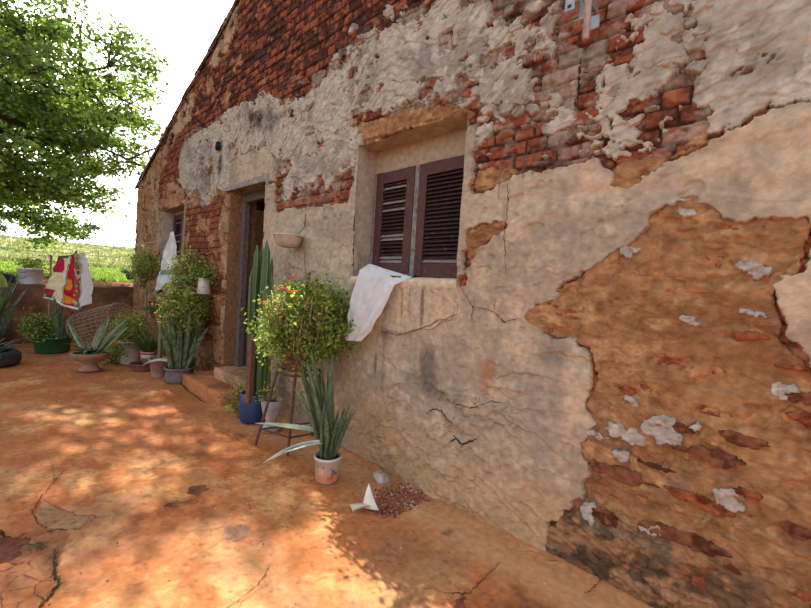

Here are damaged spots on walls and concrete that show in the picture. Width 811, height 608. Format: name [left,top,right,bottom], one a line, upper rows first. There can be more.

flaking render [131,0,811,341]
crack [0,451,96,608]
spalling [524,195,811,608]